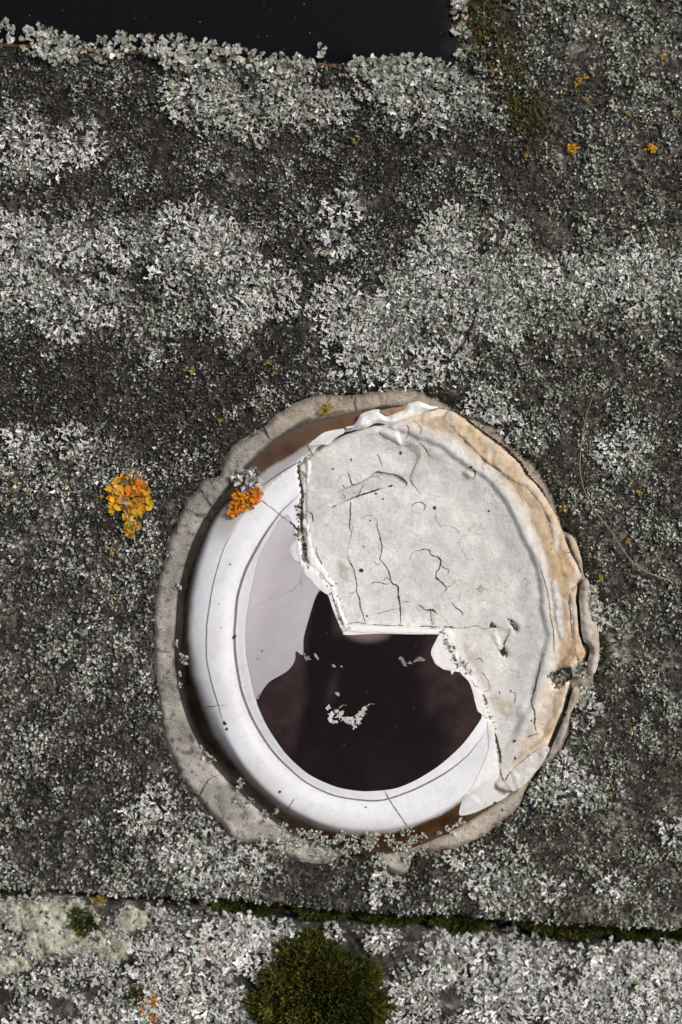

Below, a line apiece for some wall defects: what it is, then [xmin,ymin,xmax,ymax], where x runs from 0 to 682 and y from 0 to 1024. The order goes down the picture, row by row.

peeling [309,429,345,446]
spalling [323,468,408,507]
peeling [443,411,583,572]
peeling [289,541,337,595]
crack [255,421,573,792]
spalling [490,618,517,657]
water stain [552,580,565,638]
peeling [568,586,585,663]
peeling [326,692,370,730]
peeling [398,631,550,815]